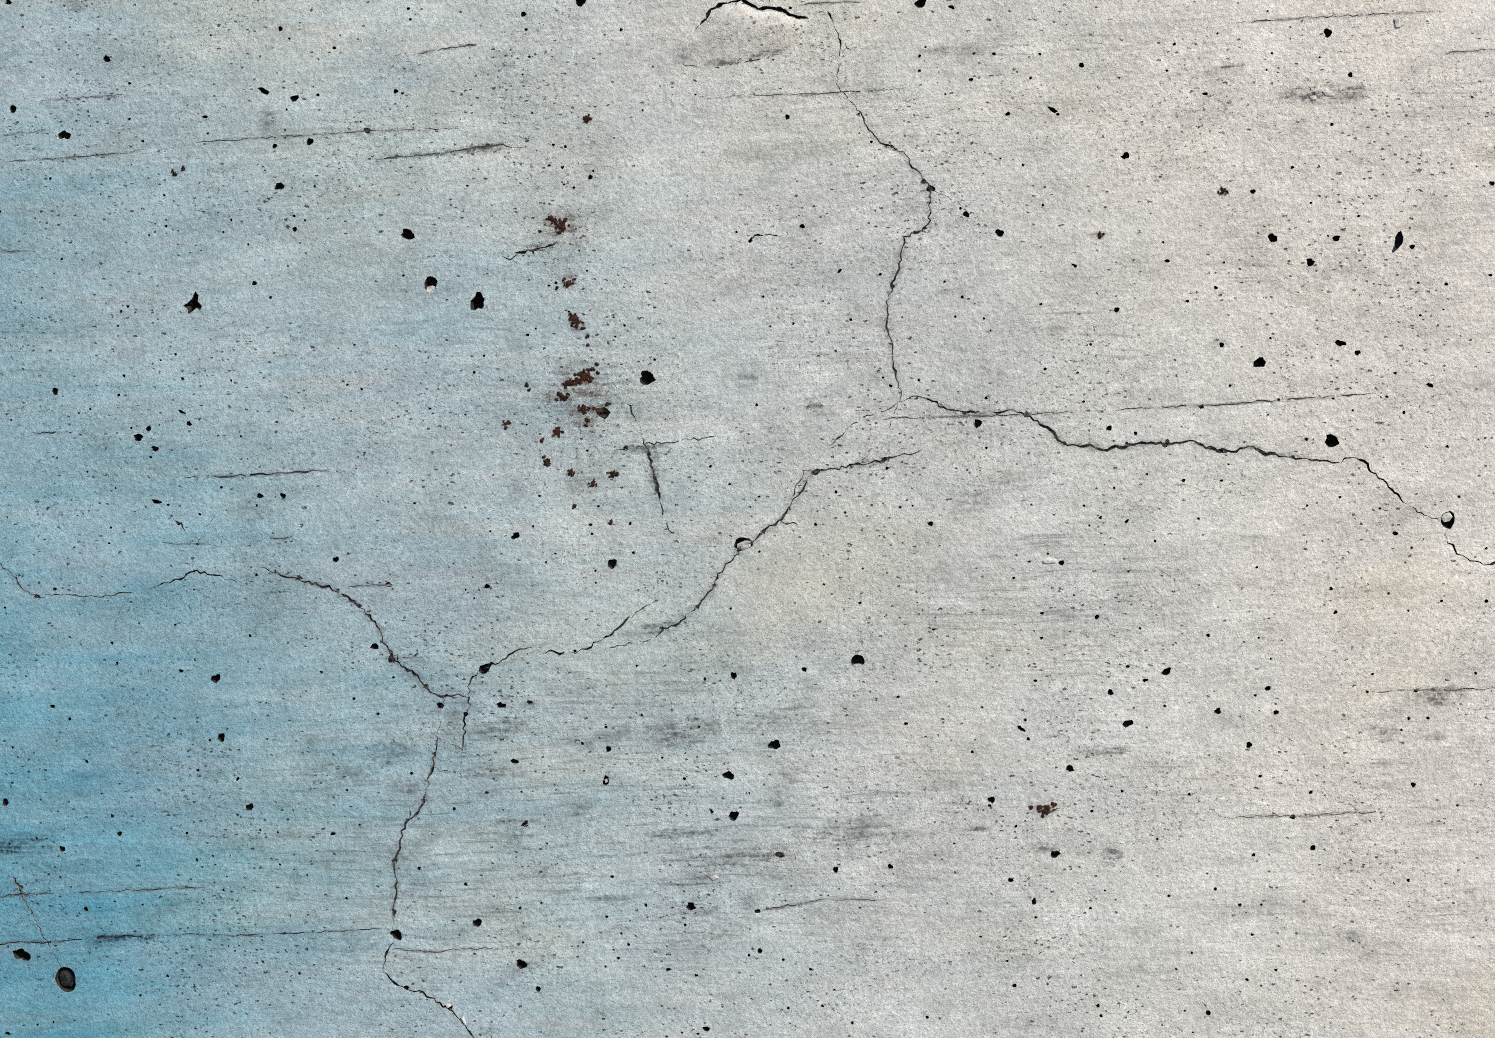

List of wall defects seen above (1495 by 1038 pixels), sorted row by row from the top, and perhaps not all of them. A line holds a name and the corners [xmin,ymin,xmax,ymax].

crack [415,44,477,55]
crack [4,94,134,162]
crack [196,128,522,160]
rust [538,215,570,234]
crack [504,242,556,261]
crack [707,1,1495,565]
rust [555,312,610,427]
rust [540,426,564,466]
rust [568,468,620,487]
crack [614,404,715,534]
crack [0,449,922,1038]
crack [1225,811,1376,819]